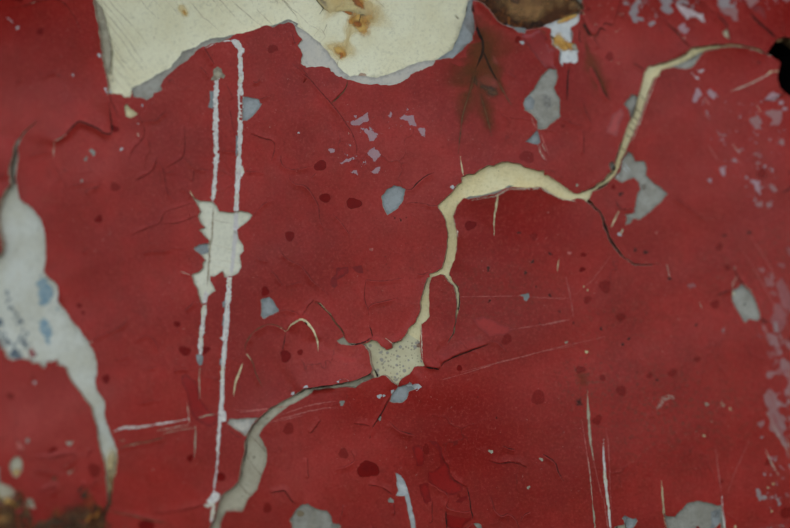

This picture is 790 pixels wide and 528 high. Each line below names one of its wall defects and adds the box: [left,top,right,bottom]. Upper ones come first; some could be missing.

rust [477,0,584,29]
peeling [93,0,584,145]
crack [458,4,516,151]
crack [560,0,737,155]
crack [728,67,778,92]
peeling [190,192,252,305]
crack [544,170,563,182]
peeling [337,29,770,403]
crack [611,202,635,234]
peeling [0,121,118,510]
rust [0,487,112,528]
spalling [665,501,736,528]